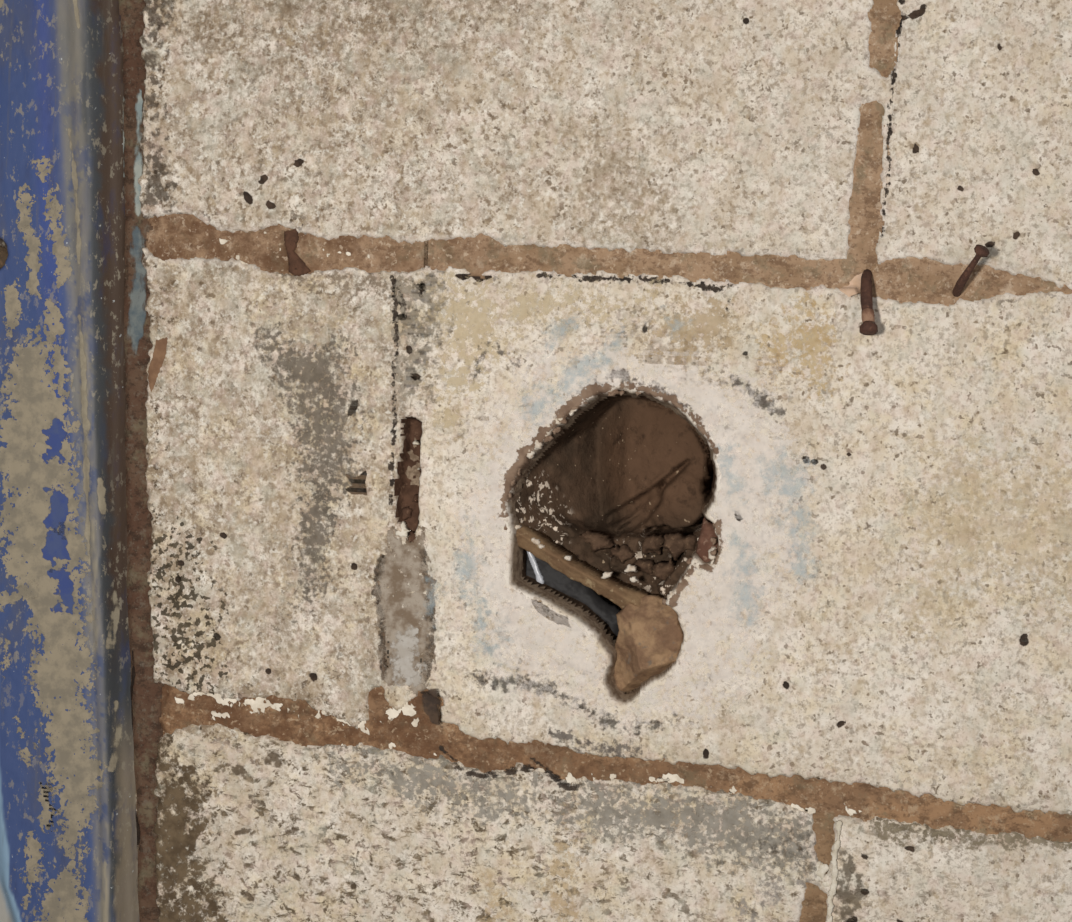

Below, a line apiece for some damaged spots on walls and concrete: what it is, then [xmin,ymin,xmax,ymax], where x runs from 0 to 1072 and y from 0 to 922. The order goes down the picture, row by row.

peeling [0,129,122,922]
crack [388,275,424,505]
spalling [498,380,723,642]